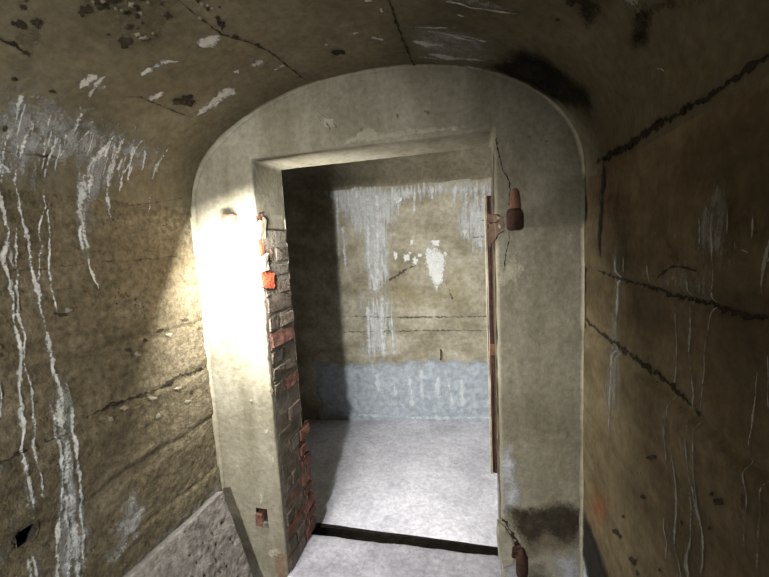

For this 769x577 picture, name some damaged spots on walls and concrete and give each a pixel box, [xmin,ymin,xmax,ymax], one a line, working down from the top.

crack [0,0,42,57]
water stain [80,74,105,89]
spalling [78,0,155,49]
hole [172,94,197,107]
crack [179,0,303,78]
crack [604,55,769,160]
water stain [0,87,168,577]
water stain [316,180,491,429]
crack [585,318,701,417]
crack [599,265,769,320]
efflorescence [662,184,749,577]
water stain [501,451,607,577]